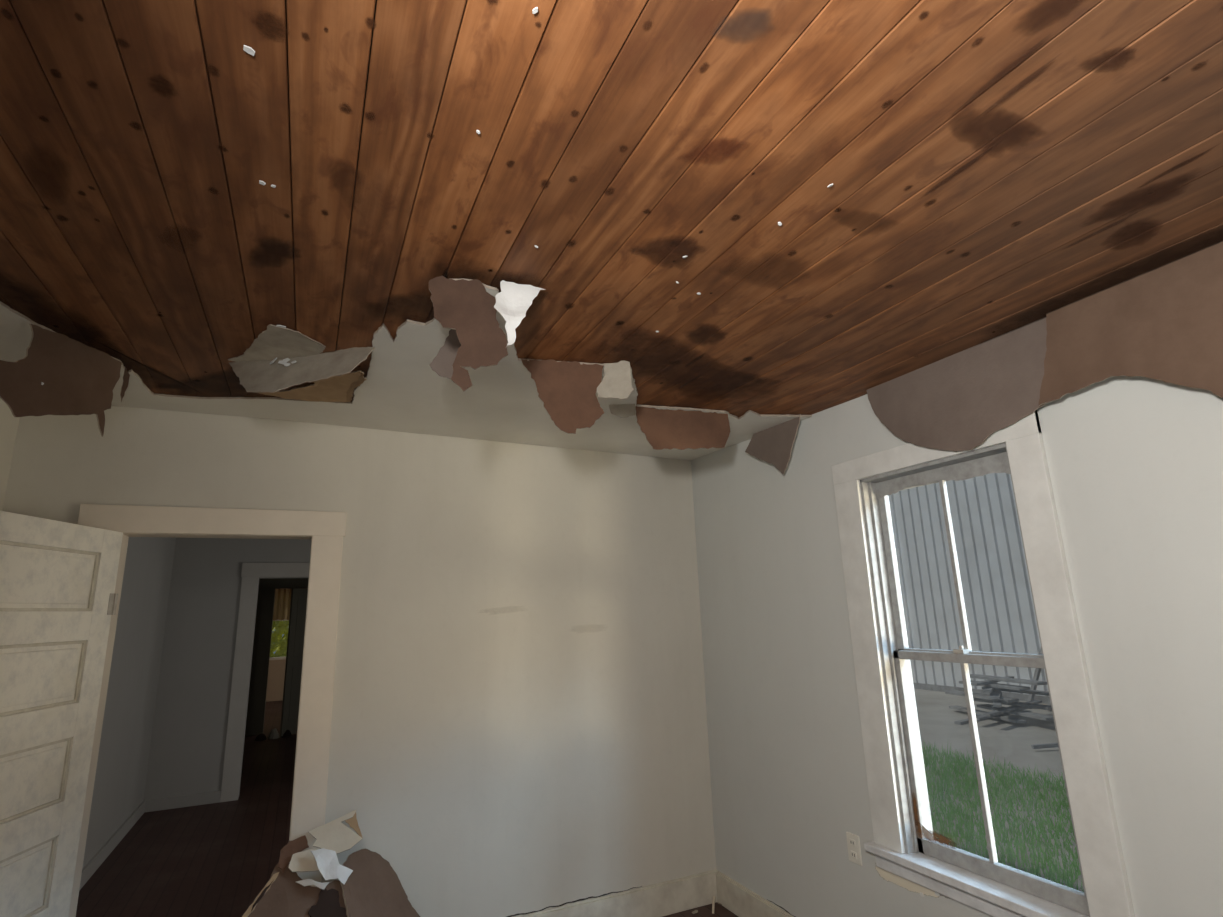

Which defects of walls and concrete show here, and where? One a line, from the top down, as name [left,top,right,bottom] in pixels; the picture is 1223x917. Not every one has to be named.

water stain [1027,0,1081,29]
water stain [1085,49,1132,69]
water stain [928,42,1050,194]
water stain [637,239,698,264]
peeling [120,367,130,402]
water stain [0,282,257,397]
peeling [228,324,375,402]
peeling [494,280,546,347]
peeling [597,361,635,418]
water stain [614,326,763,397]